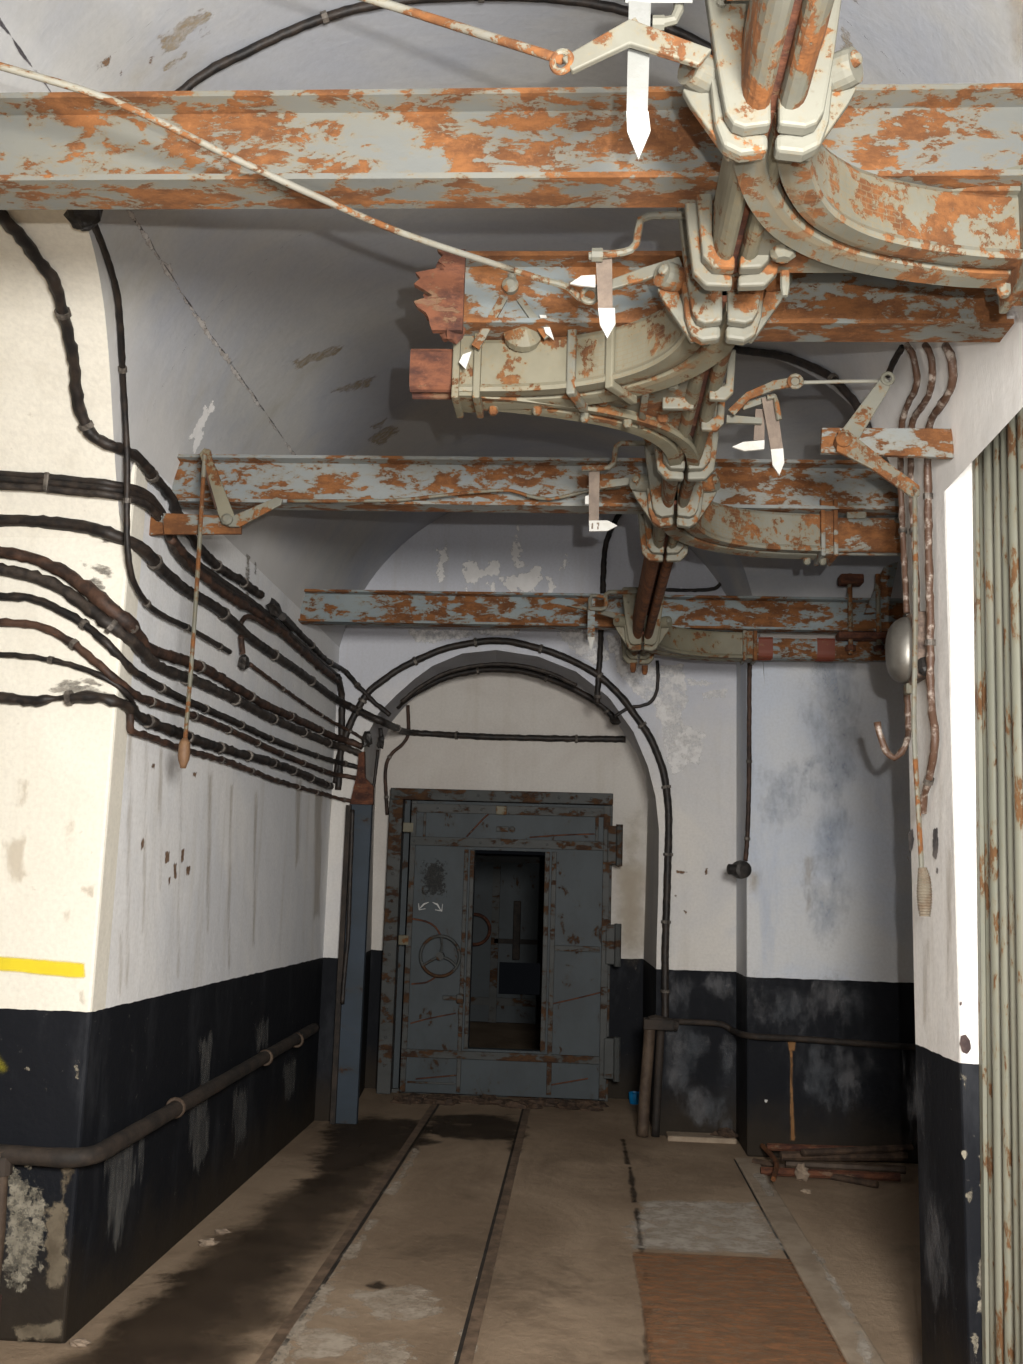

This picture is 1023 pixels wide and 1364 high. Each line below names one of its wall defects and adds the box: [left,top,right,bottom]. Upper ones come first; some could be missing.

peeling [435,525,568,593]
peeling [2,1165,74,1292]
water stain [62,1115,525,1364]